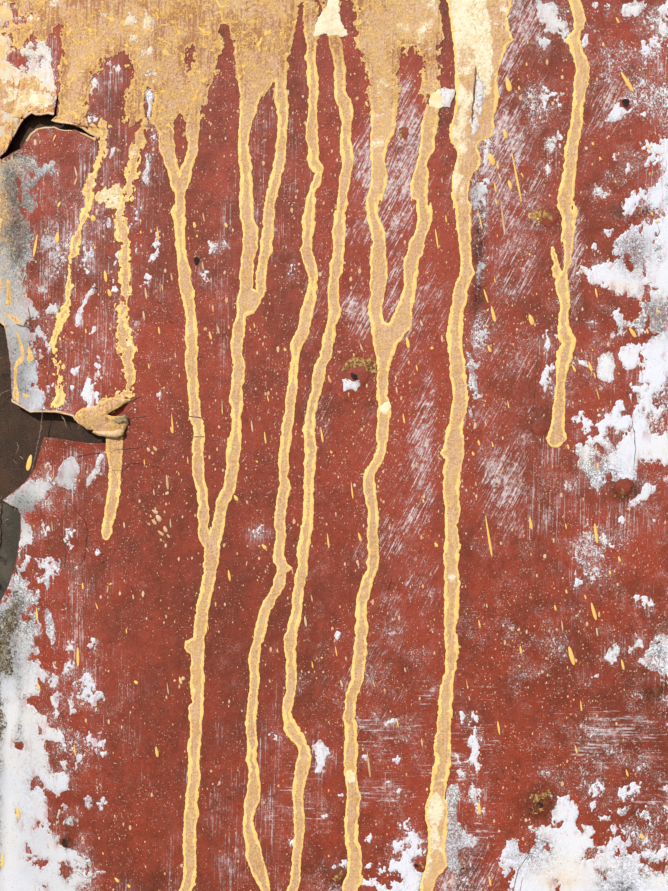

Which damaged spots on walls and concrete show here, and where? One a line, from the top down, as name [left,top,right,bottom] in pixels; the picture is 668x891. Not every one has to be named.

peeling [535,0,570,51]
peeling [621,0,647,17]
peeling [641,0,668,64]
peeling [0,0,57,144]
peeling [605,99,646,123]
peeling [0,150,58,411]
peeling [135,230,161,287]
peeling [571,138,668,507]
peeling [70,350,105,408]
peeling [539,329,557,392]
peeling [0,452,108,891]
peeling [496,779,668,891]